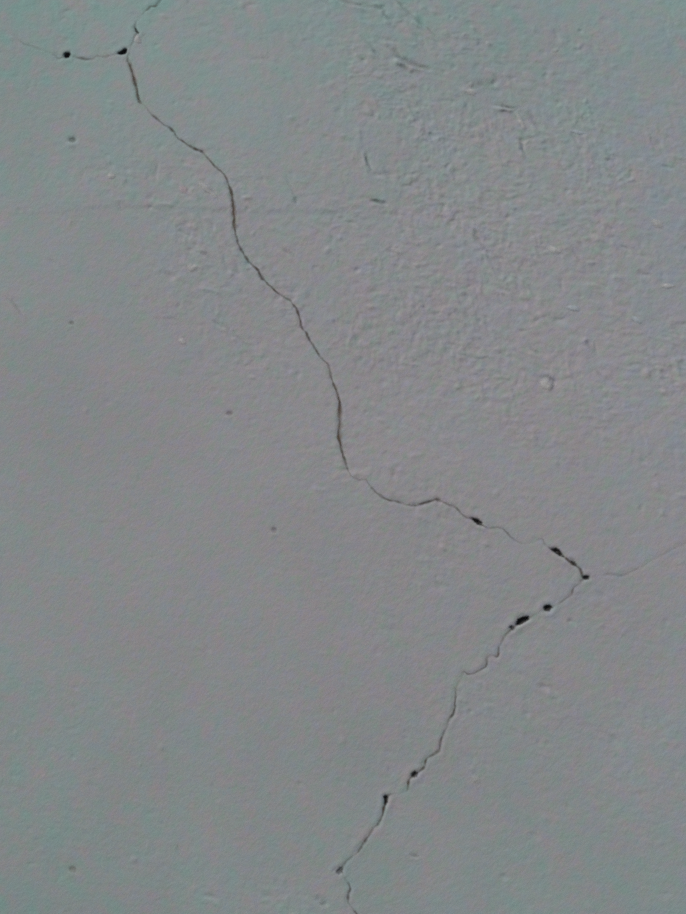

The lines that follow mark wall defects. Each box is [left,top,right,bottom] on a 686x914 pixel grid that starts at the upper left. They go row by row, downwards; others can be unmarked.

crack [118,28,139,96]
crack [331,378,345,460]
crack [551,548,589,580]
crack [511,605,553,630]